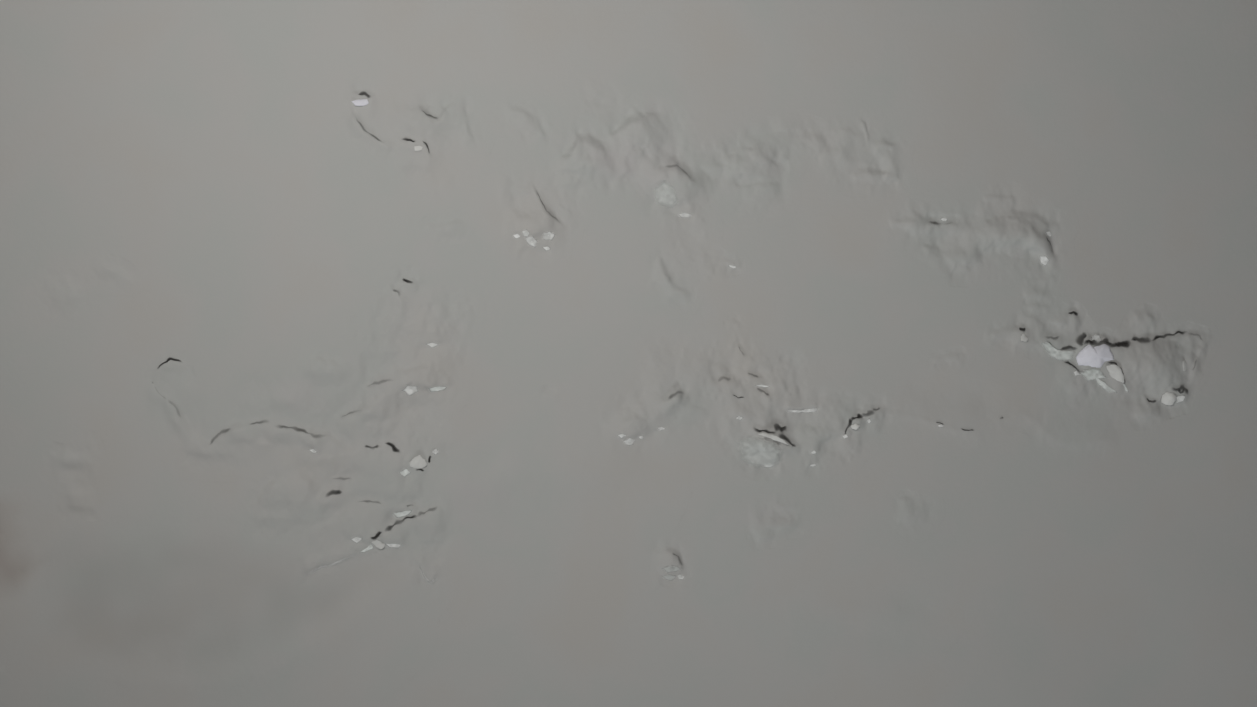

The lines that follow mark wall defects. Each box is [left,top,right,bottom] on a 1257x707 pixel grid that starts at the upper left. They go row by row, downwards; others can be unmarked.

spalling [976,294,1220,427]